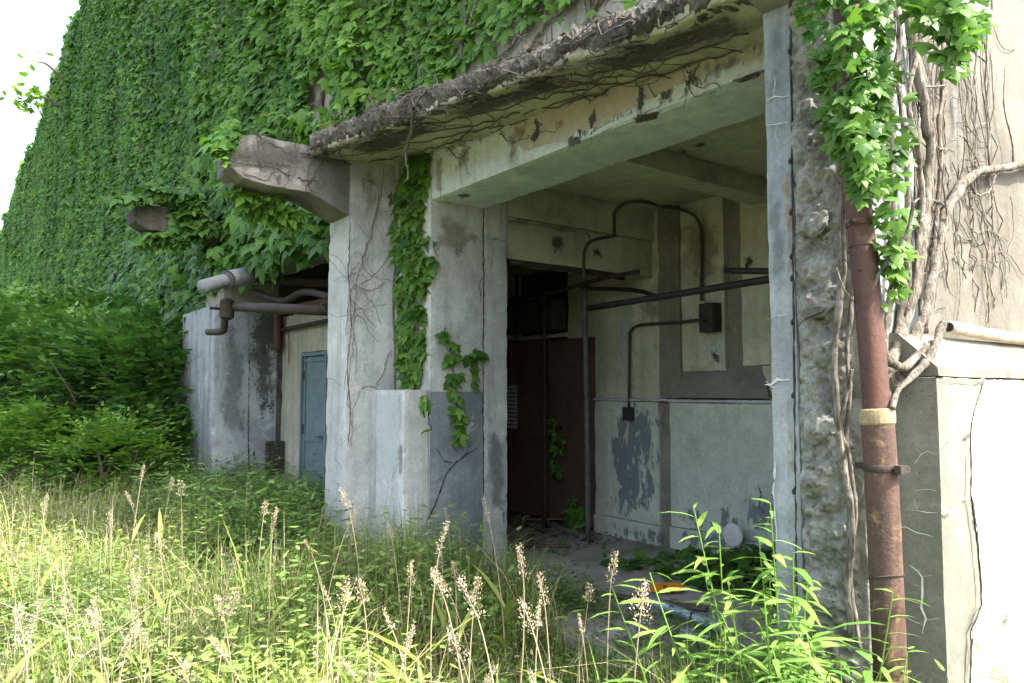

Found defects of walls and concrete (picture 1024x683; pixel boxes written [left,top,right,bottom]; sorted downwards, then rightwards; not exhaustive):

flaking render [513,43,765,151]
leakage [222,312,282,427]
crack [427,208,505,521]
crack [917,375,1002,383]
peeling [609,401,664,543]
crack [901,436,983,683]